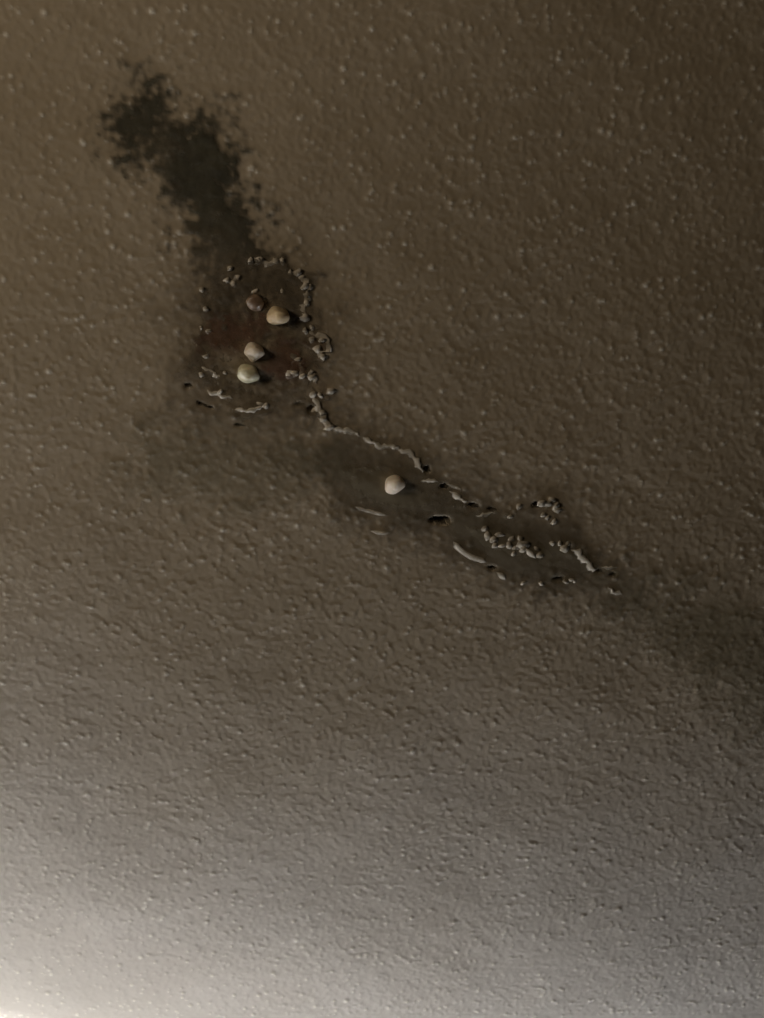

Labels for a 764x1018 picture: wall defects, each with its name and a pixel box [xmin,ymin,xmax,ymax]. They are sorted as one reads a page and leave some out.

water stain [101,75,297,330]
spalling [181,256,336,431]
peeling [481,525,570,558]
peeling [507,497,562,525]